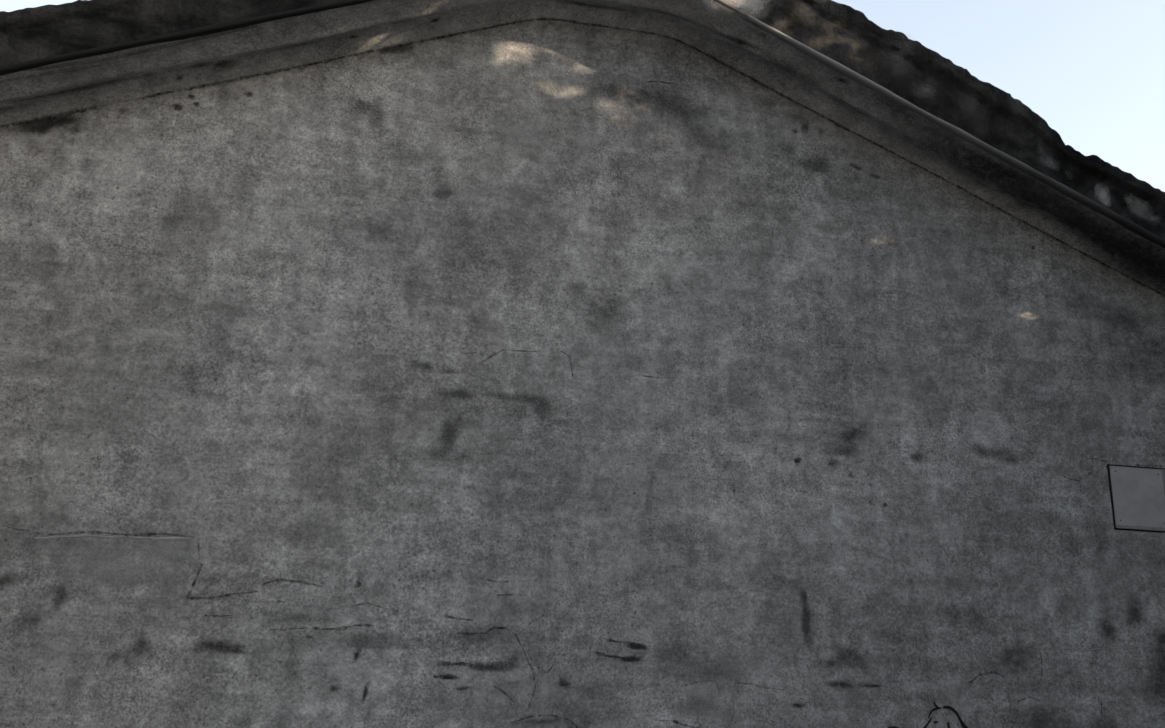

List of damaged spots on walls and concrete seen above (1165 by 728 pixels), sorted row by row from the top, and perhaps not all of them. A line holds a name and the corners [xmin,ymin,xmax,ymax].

crack [4,526,398,631]